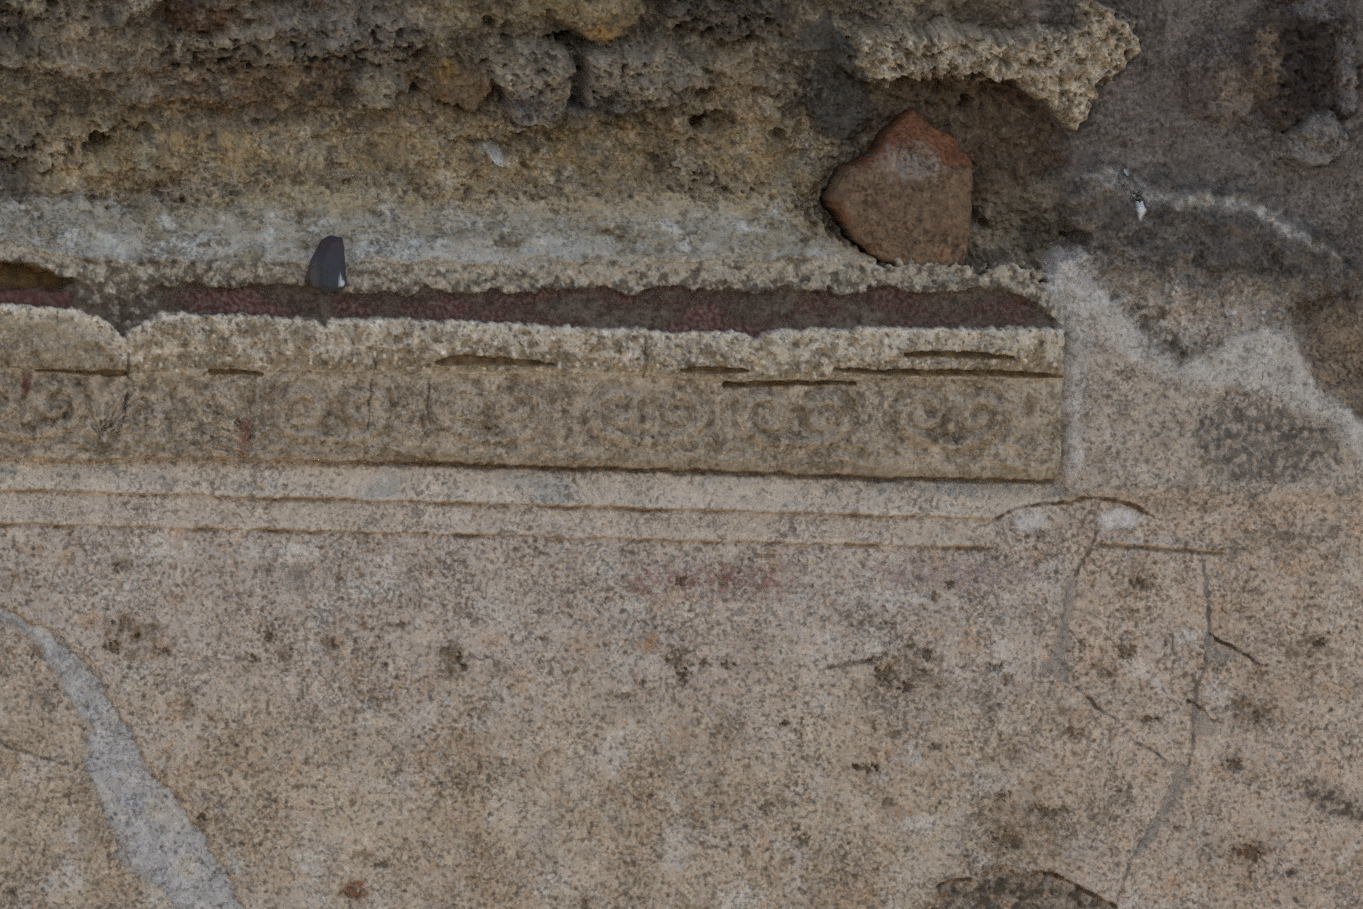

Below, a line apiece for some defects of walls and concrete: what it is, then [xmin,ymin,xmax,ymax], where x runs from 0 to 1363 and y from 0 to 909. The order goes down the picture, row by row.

spalling [305,235,347,292]
peeling [0,289,74,308]
peeling [168,284,307,318]
peeling [650,285,840,336]
peeling [857,285,1032,327]
crack [997,496,1143,718]
crack [1125,554,1259,877]
crack [0,608,245,909]
spalling [937,870,1117,909]